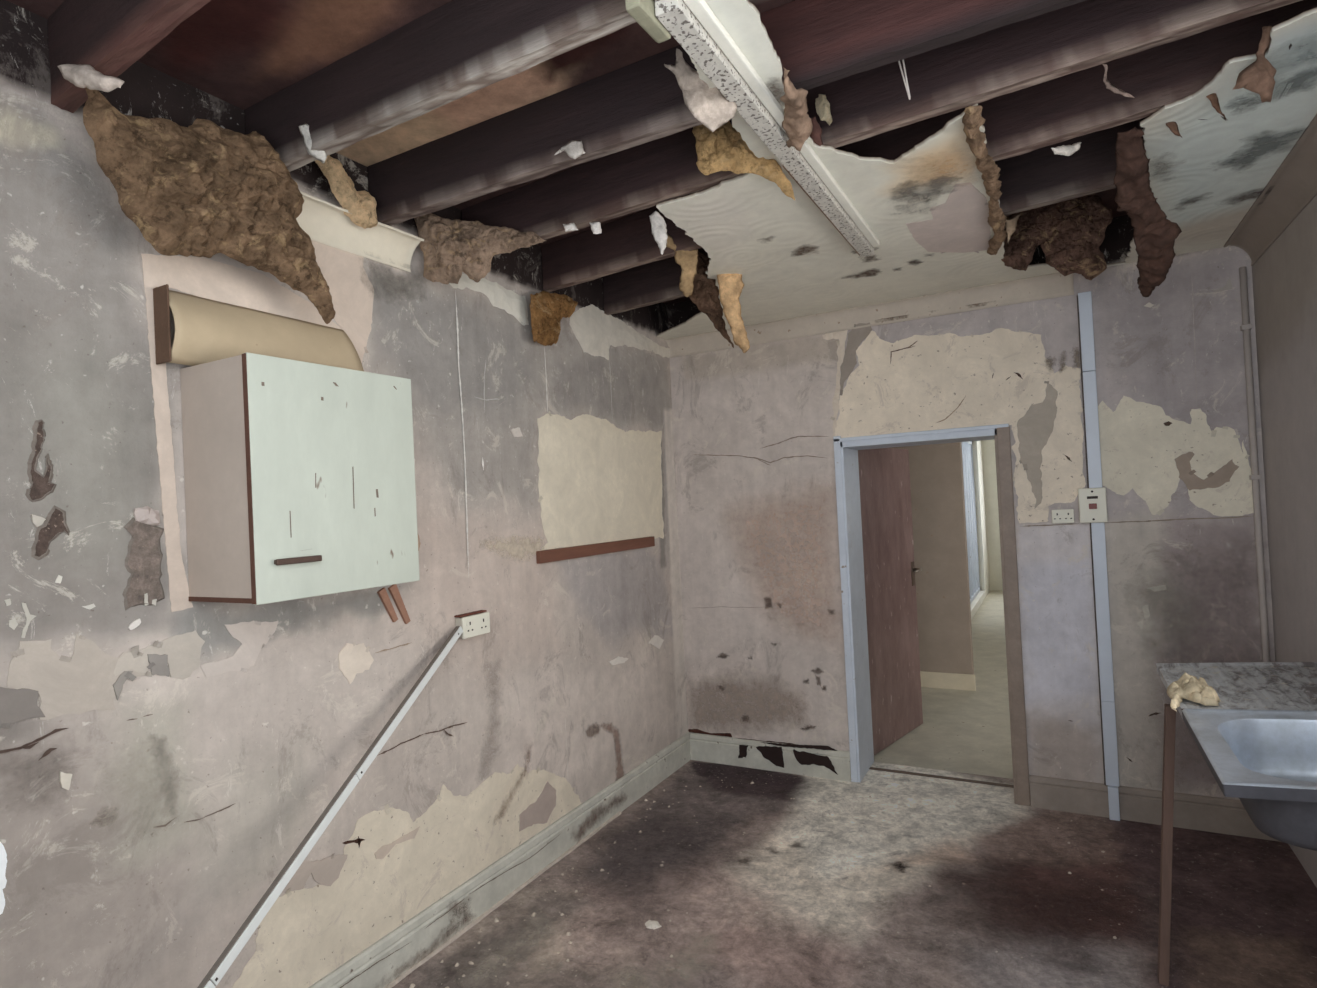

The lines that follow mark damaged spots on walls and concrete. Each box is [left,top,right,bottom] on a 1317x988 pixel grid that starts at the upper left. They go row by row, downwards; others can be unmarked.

leakage [1273,46,1317,99]
leakage [896,160,953,211]
leakage [1232,189,1272,201]
mould [1223,130,1303,169]
spalling [570,304,670,360]
peeling [830,324,1254,523]
spalling [25,419,70,560]
flaking render [511,411,664,551]
flaking render [122,506,165,630]
peeling [7,621,278,720]
peeling [738,742,838,775]
peeling [232,764,582,988]